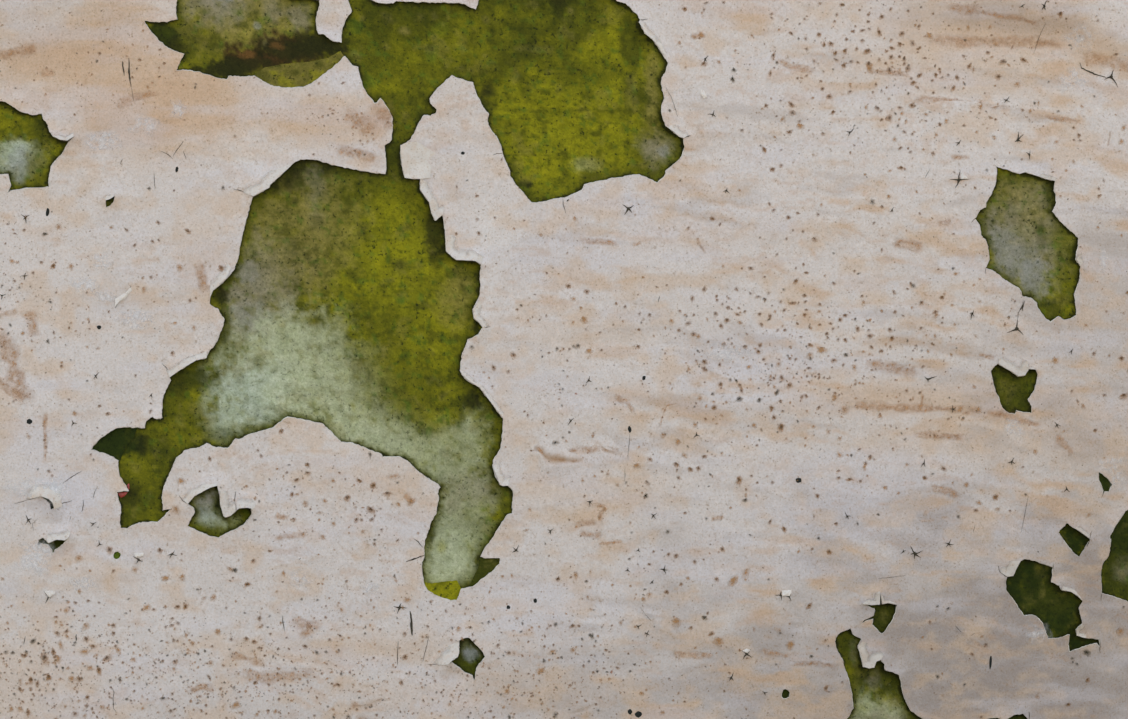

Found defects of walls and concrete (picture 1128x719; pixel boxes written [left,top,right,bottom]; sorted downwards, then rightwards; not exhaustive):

peeling [0,101,74,192]
peeling [975,166,1084,322]
peeling [91,0,688,601]
peeling [991,357,1038,414]
peeling [1058,523,1090,557]
peeling [1101,510,1128,602]
peeling [1000,559,1100,652]
peeling [435,638,485,680]
peeling [835,591,923,719]